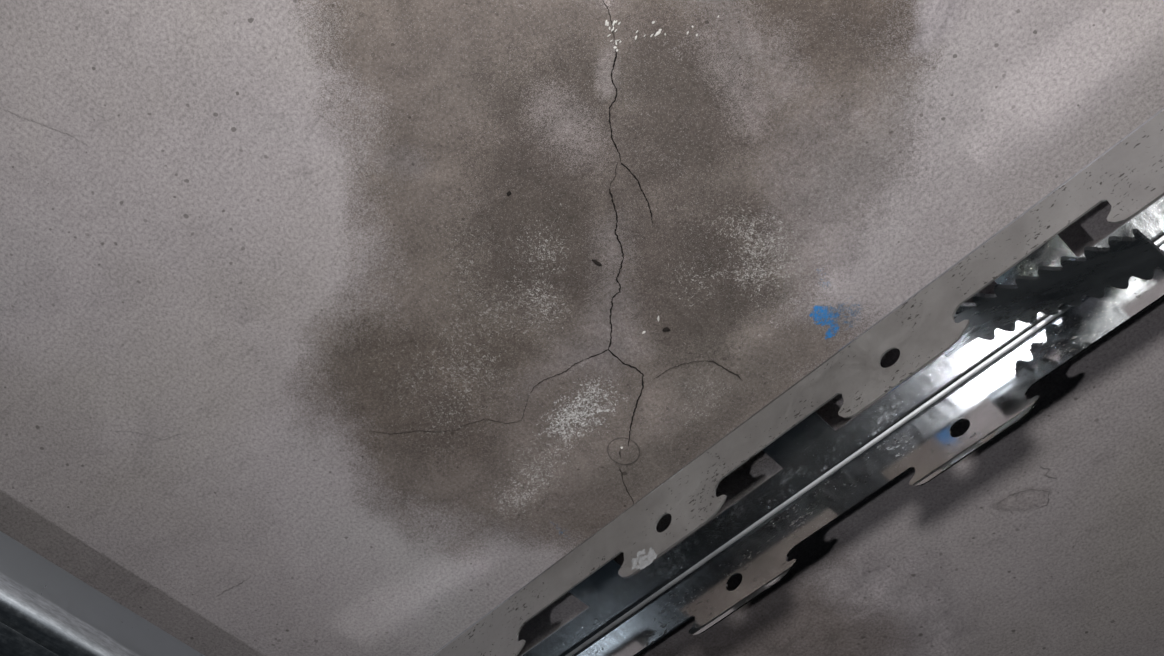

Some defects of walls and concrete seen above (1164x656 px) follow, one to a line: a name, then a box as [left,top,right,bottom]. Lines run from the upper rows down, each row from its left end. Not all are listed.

crack [370,1,741,504]
leakage [264,0,975,566]